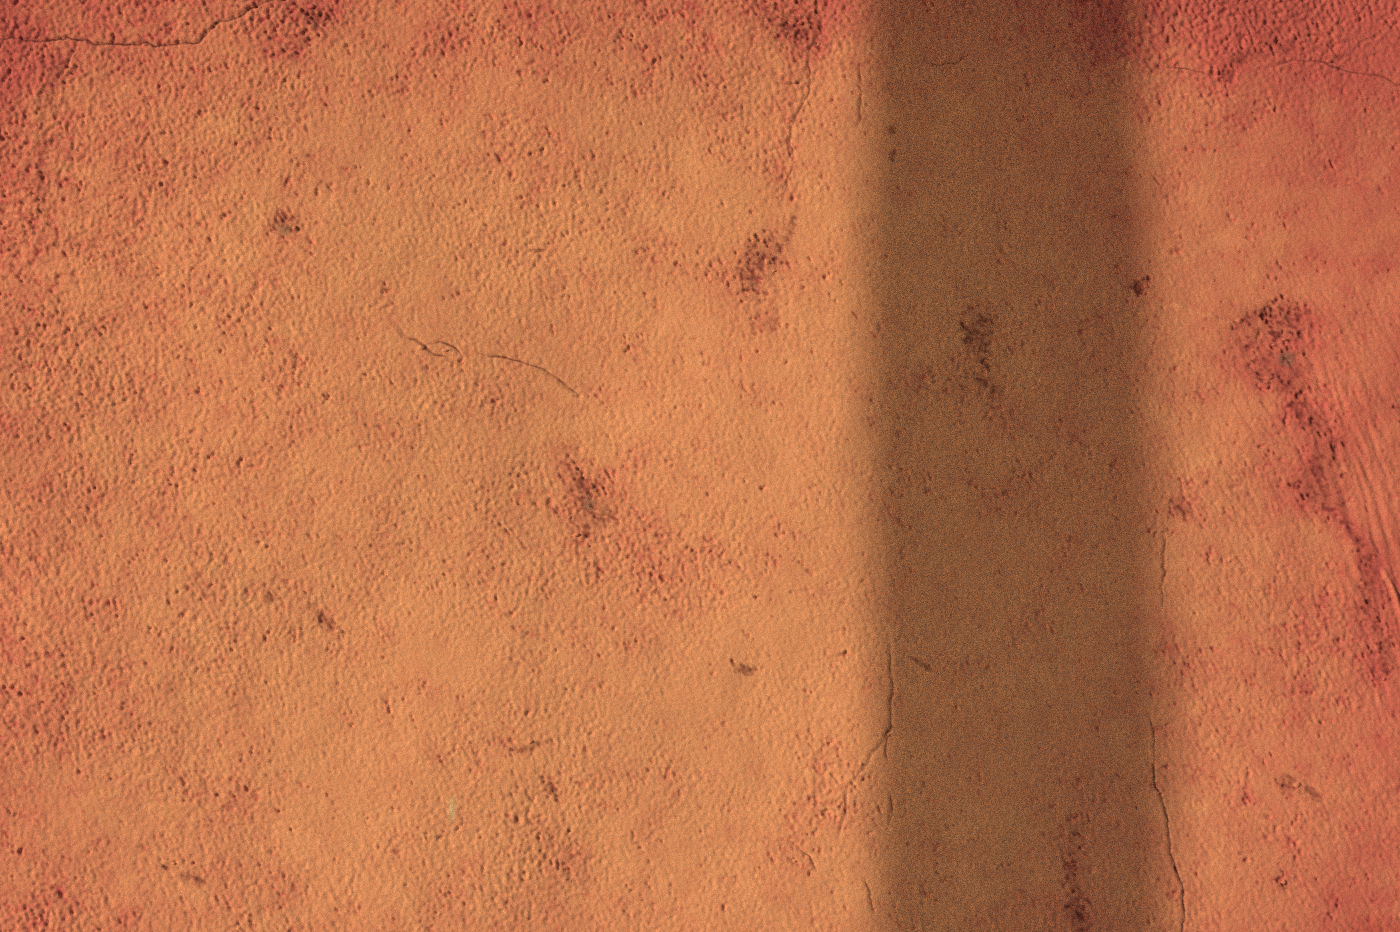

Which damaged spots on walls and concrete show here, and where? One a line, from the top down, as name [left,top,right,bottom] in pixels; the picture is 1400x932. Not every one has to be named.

crack [4,7,255,58]
crack [1151,724,1185,932]